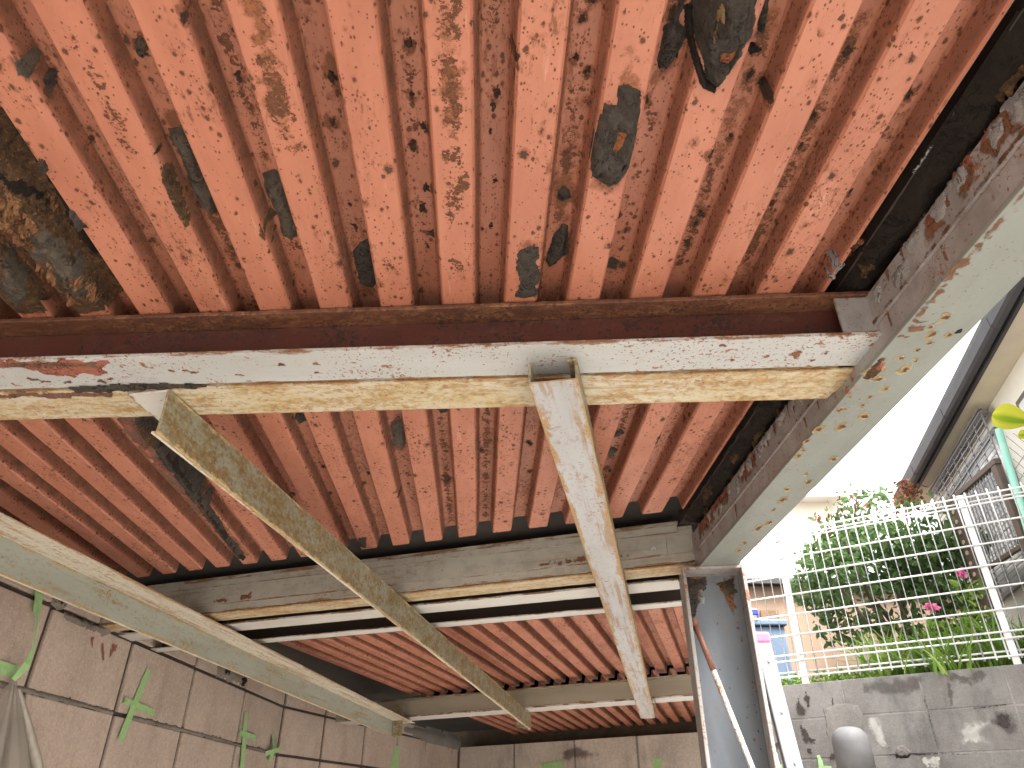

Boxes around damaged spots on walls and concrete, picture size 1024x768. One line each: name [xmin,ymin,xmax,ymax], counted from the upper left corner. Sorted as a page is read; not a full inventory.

peeling [0,358,113,399]
peeling [117,417,203,514]
rust [217,0,306,268]
rust [414,0,470,248]
peeling [698,399,803,539]
rust [684,11,1024,535]
peeling [866,85,1024,306]
rust [685,576,743,642]